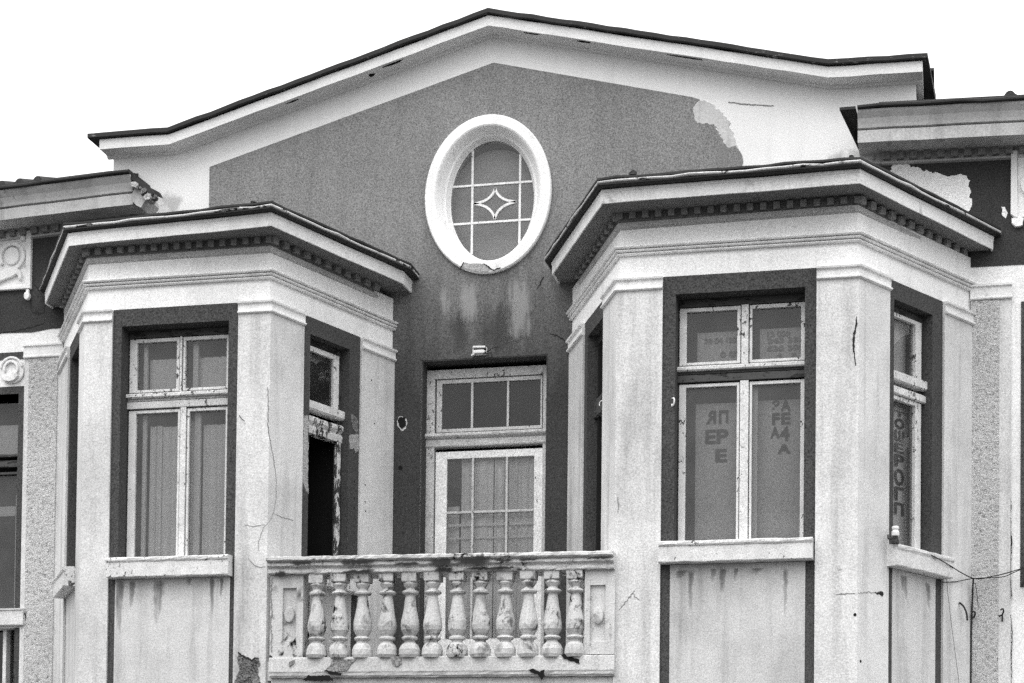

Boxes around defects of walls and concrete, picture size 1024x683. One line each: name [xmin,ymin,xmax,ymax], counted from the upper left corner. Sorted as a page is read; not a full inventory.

peeling [693,100,743,168]
peeling [890,164,972,211]
crack [850,316,858,365]
crack [248,387,292,652]
spalling [234,652,261,683]